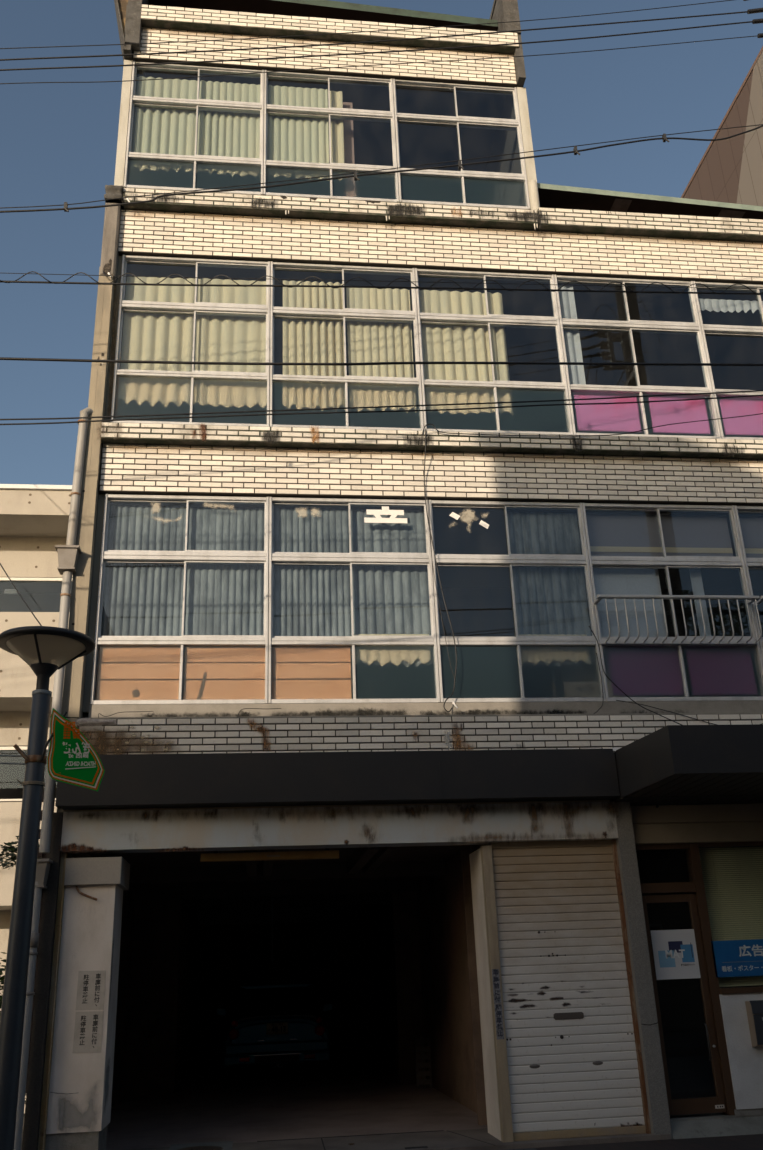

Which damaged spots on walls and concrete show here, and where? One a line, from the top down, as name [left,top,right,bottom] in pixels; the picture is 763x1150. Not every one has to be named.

damp [387,204,423,216]
damp [509,211,550,228]
rust [248,720,269,749]
rust [61,844,106,853]